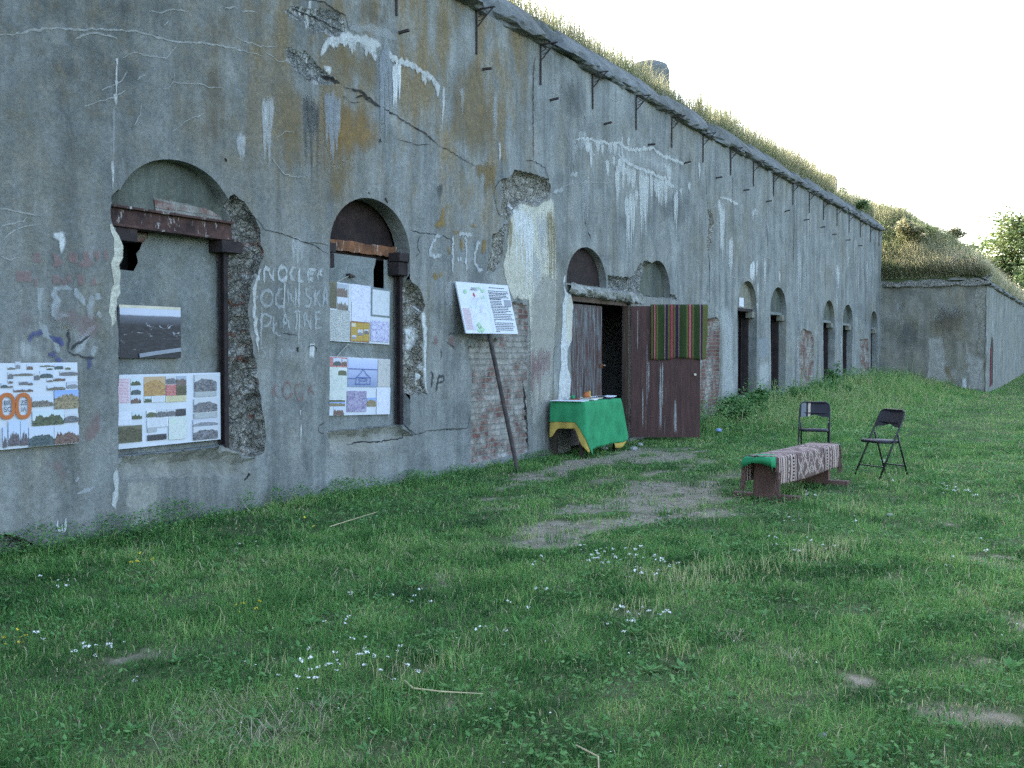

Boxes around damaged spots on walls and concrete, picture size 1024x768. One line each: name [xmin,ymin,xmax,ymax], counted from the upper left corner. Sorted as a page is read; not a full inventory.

spalling [286,47,333,85]
spalling [284,6,347,37]
leakage [321,32,445,129]
crack [321,75,475,166]
spalling [486,170,551,273]
leakage [575,134,700,246]
flaking render [467,276,572,463]
crack [348,418,470,445]